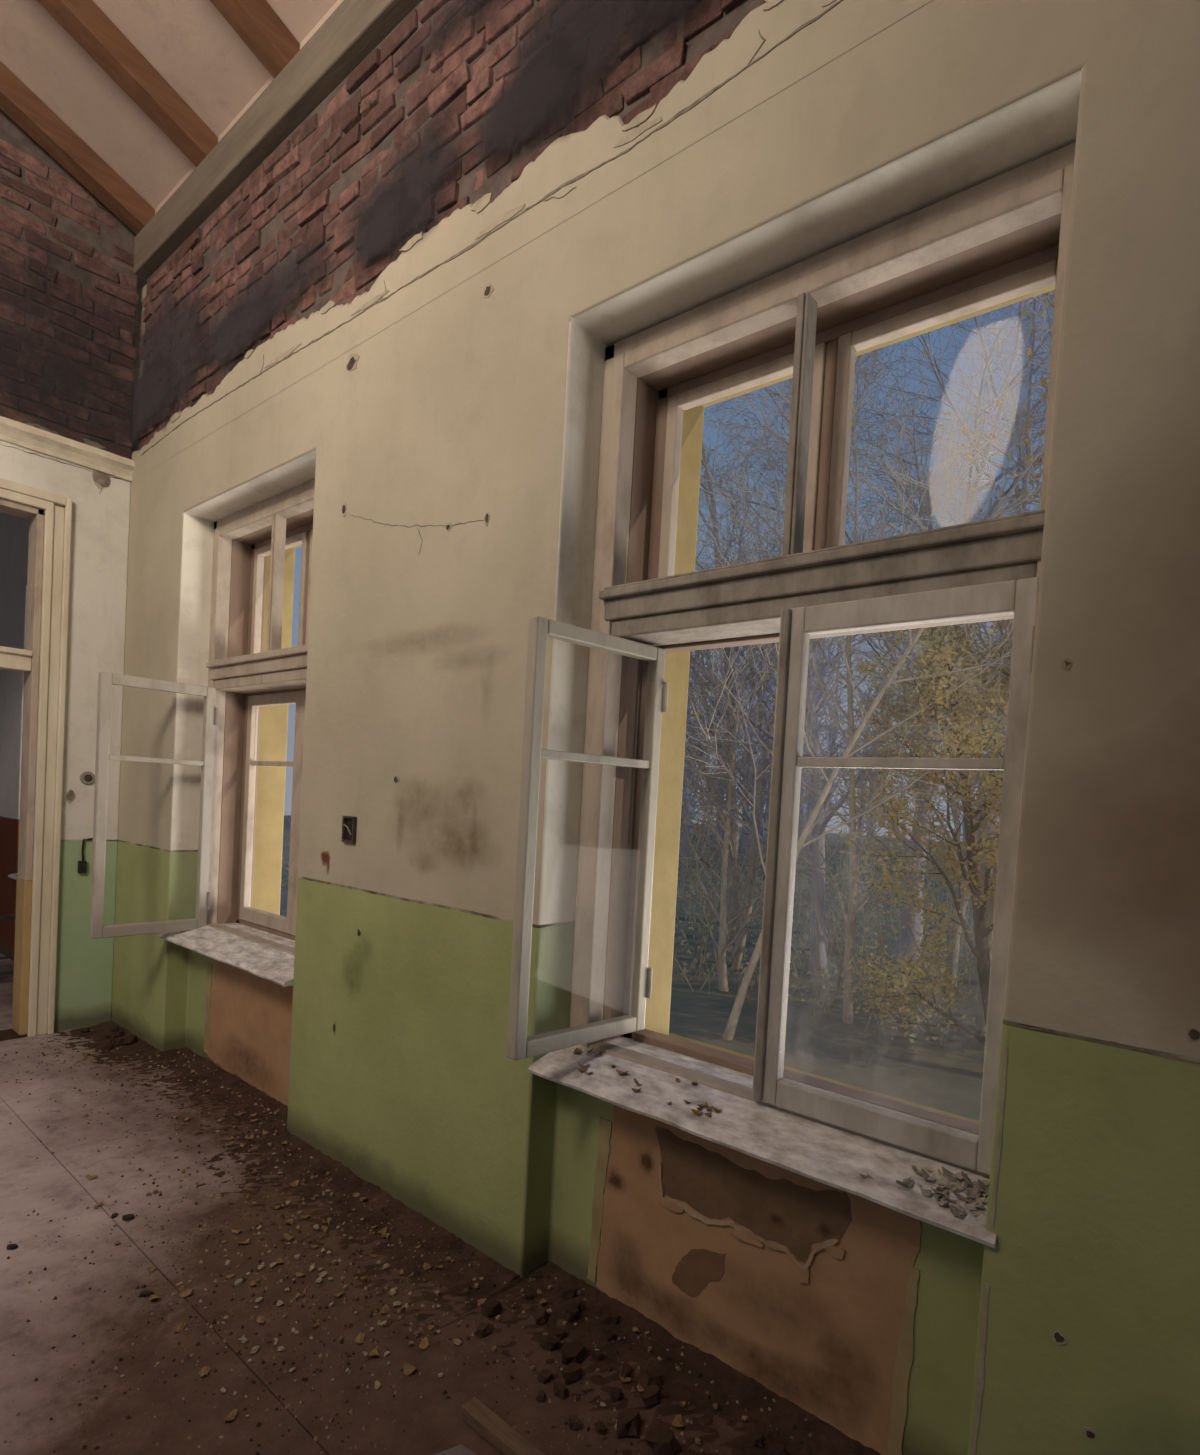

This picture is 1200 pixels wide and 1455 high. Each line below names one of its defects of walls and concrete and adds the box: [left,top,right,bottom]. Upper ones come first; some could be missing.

flaking render [0,0,784,459]
crack [1,0,843,494]
spalling [92,470,111,489]
peeling [177,960,293,1114]
peeling [587,1105,922,1455]